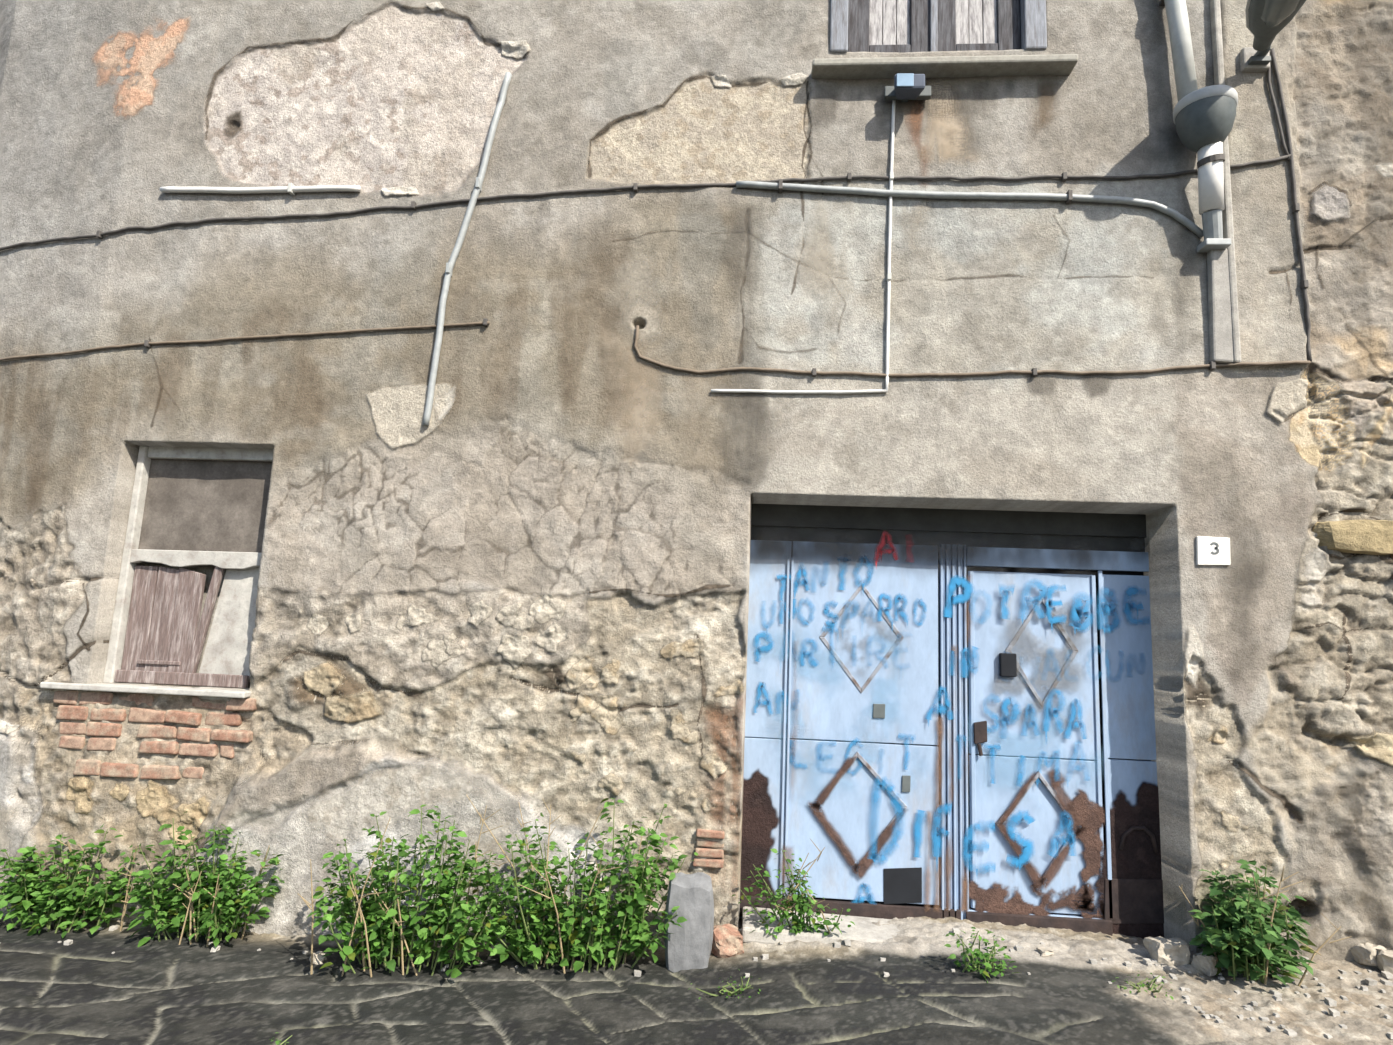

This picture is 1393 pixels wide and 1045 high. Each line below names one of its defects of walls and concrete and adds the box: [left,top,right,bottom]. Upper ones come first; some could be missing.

peeling [94,18,189,117]
spalling [205,1,531,196]
spalling [586,72,812,187]
crack [616,95,813,363]
crack [947,273,1023,281]
crack [1269,181,1393,302]
spalling [1267,368,1393,472]
crack [1306,362,1393,384]
peeling [1302,548,1327,608]
spalling [0,504,745,943]
spalling [1183,627,1303,928]
peeling [1348,733,1393,766]